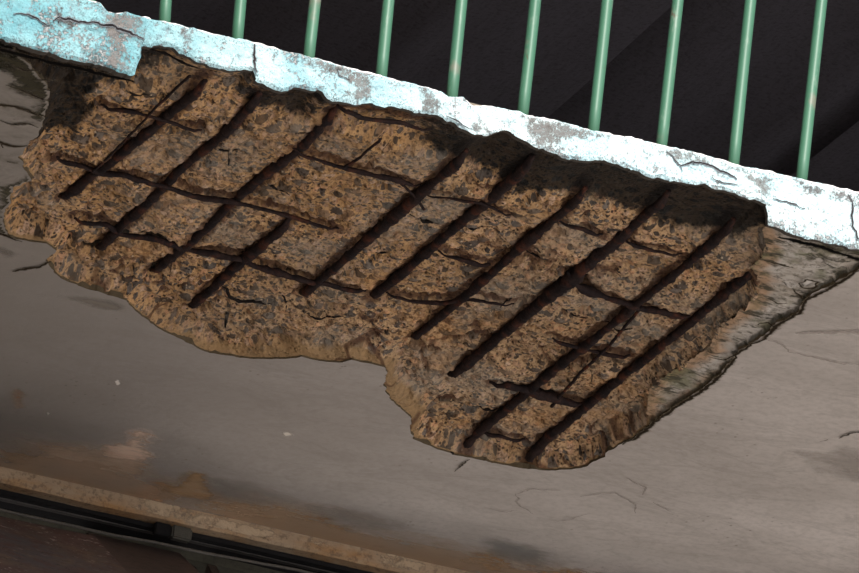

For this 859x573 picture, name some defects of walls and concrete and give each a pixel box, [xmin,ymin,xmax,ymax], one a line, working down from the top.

crack [0,48,134,163]
spalling [4,13,859,469]
crack [666,151,737,185]
crack [622,194,859,445]